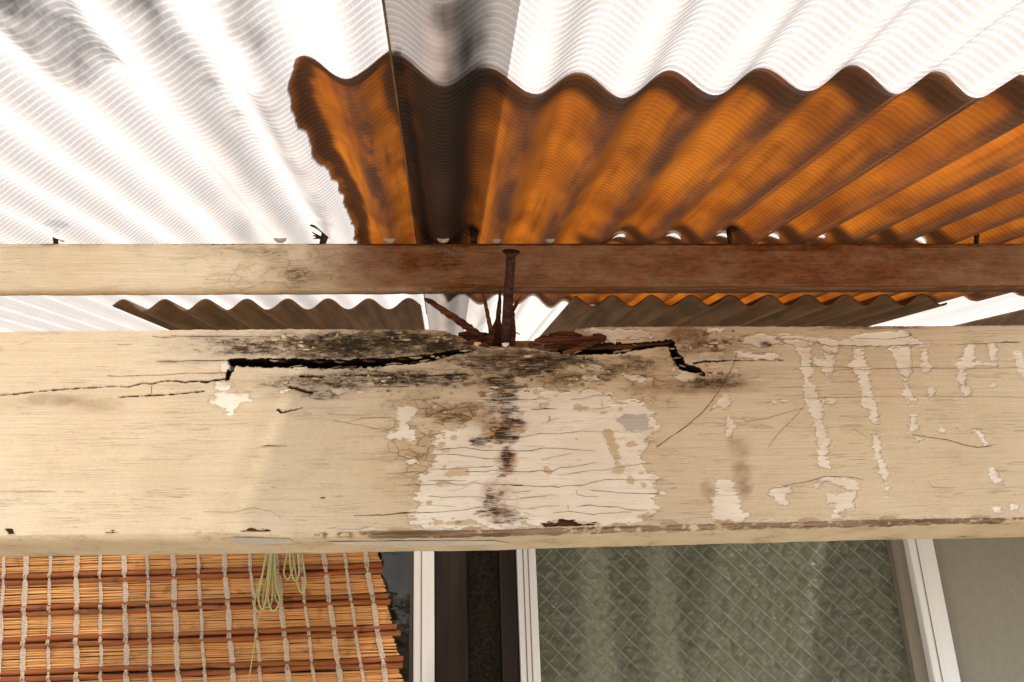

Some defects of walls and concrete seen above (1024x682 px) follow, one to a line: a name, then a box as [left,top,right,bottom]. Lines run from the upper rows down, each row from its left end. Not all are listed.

peeling [208,361,253,417]
crack [13,335,473,398]
leakage [264,333,454,354]
peeling [955,343,1000,398]
leakage [379,354,594,523]
peeling [271,355,777,546]
peeling [672,328,936,521]
peeling [988,467,1004,486]